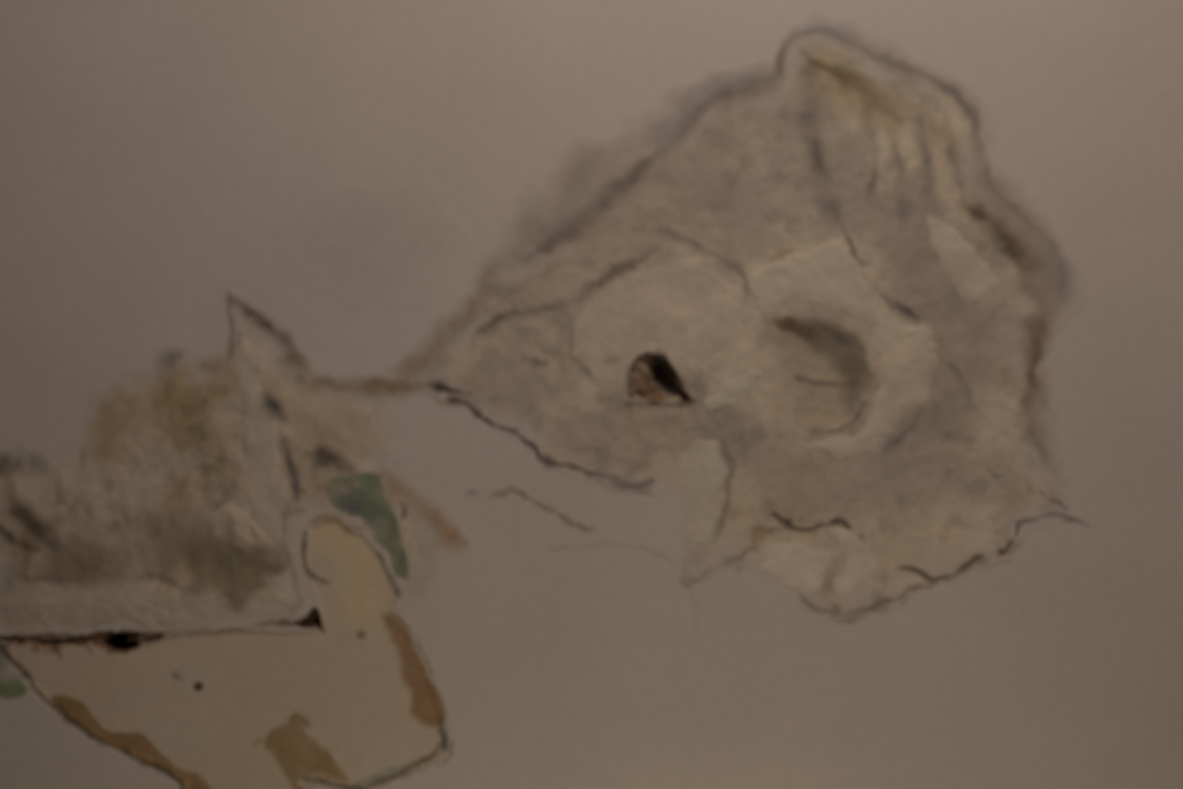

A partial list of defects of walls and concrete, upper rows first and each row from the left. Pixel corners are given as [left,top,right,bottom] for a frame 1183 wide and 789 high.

spalling [435,37,1081,624]
water stain [85,374,154,470]
crack [427,376,657,496]
crack [0,439,75,564]
water stain [35,528,140,593]
water stain [141,501,294,615]
spalling [0,286,453,789]
crack [684,512,850,630]